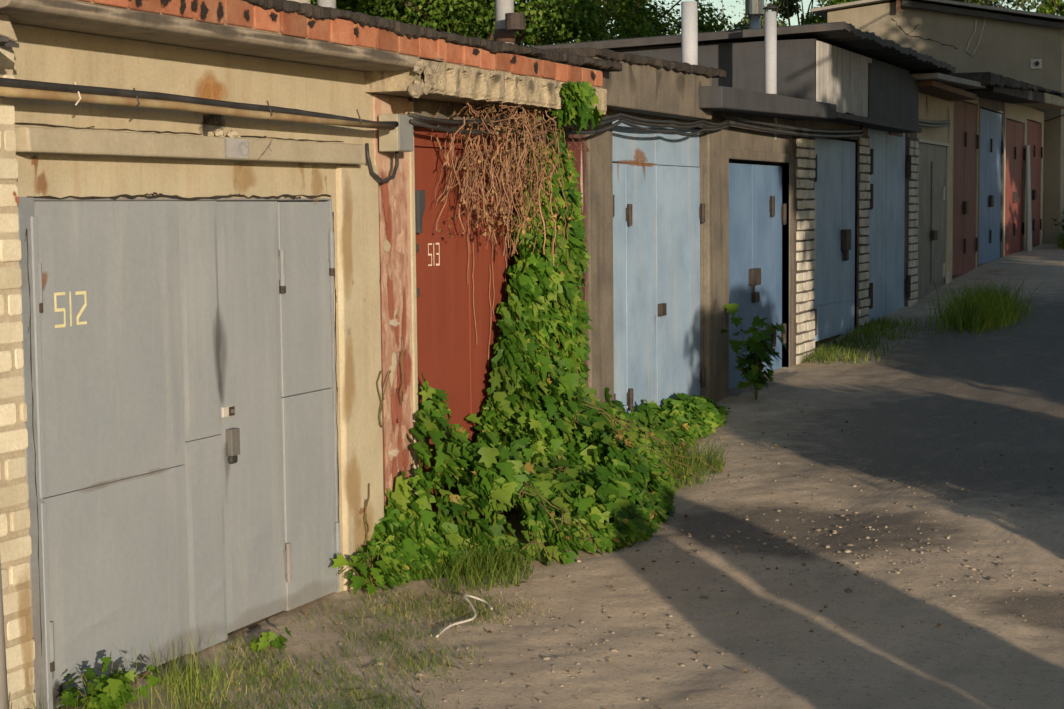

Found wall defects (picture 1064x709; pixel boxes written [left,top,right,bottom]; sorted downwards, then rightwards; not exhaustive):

rust [199,77,223,100]
spalling [408,59,436,98]
peeling [379,155,407,254]
peeling [380,269,412,506]